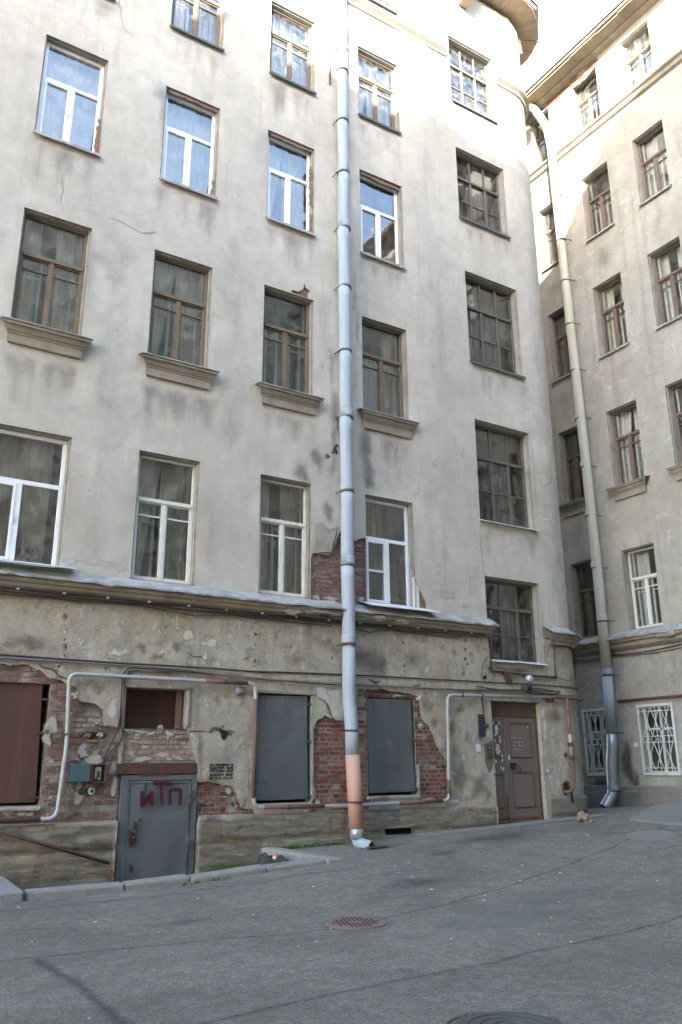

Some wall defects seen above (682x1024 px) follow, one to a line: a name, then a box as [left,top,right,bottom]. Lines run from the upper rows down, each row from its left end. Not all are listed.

spalling [311,522,342,603]
spalling [354,538,366,605]
peeling [176,627,218,660]
spalling [0,664,195,824]
spalling [311,687,348,811]
spalling [196,782,255,823]